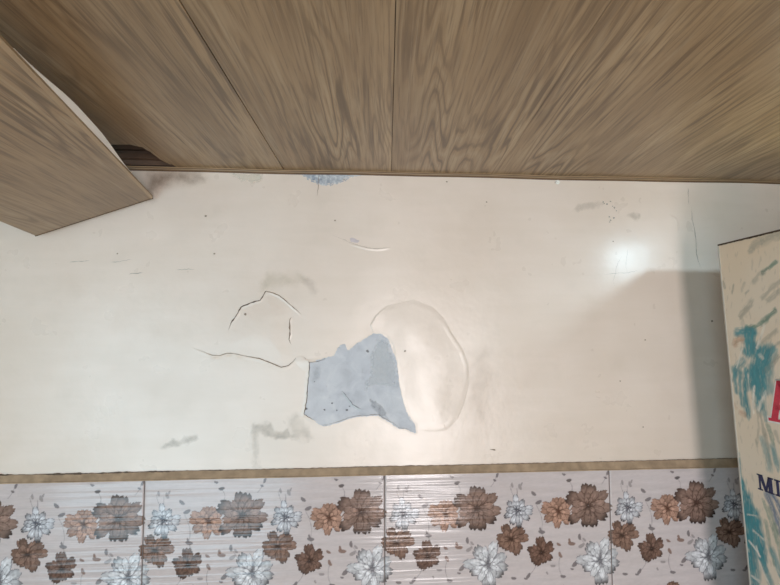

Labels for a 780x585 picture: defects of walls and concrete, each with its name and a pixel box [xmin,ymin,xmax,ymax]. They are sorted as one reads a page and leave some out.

spalling [303,175,361,195]
crack [190,291,301,371]
spalling [294,331,418,435]